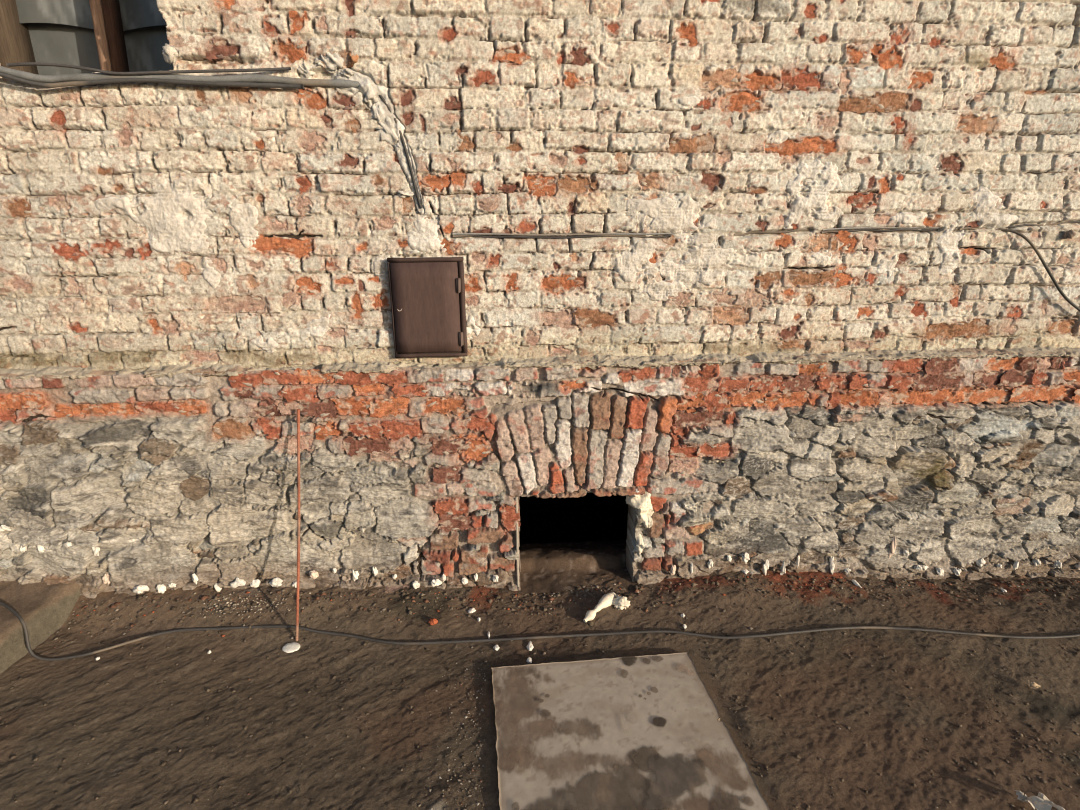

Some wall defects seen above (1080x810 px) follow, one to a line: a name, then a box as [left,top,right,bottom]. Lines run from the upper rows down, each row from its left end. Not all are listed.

spalling [208,218,314,314]
spalling [0,391,207,424]
spalling [561,367,593,390]
crack [594,388,657,400]
spalling [619,363,658,382]
spalling [212,368,495,484]